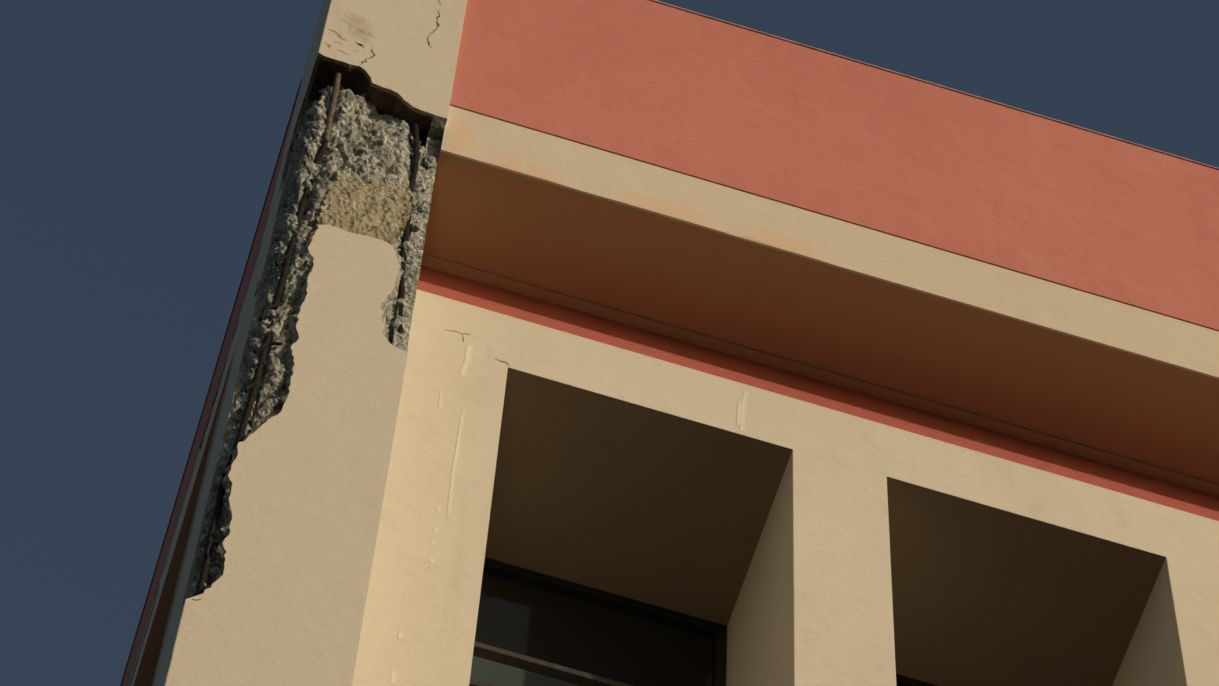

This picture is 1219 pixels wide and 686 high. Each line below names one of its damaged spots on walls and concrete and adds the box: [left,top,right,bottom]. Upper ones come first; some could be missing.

spalling [180,0,447,614]
crack [427,0,440,48]